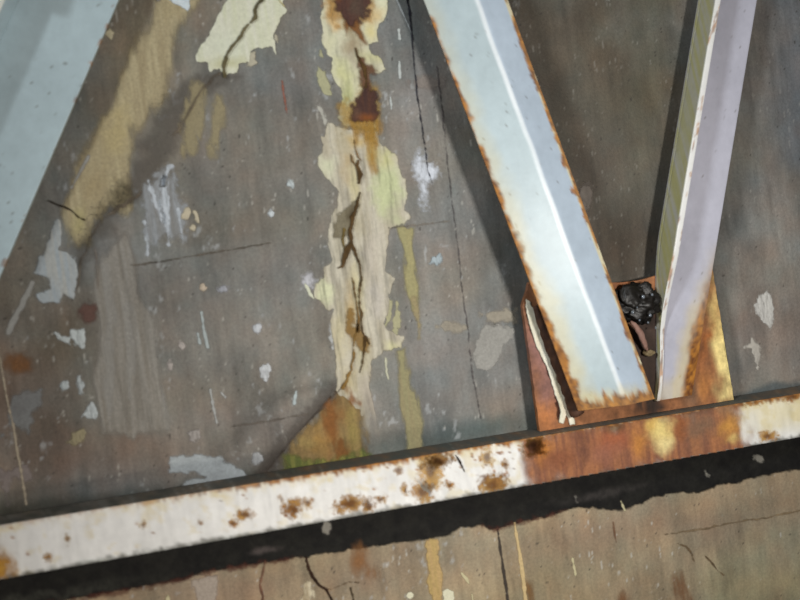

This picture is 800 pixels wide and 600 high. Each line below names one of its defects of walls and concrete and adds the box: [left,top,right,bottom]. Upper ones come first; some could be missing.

leakage [62,0,226,260]
peeling [196,0,287,74]
rust [328,0,371,42]
rust [341,57,379,171]
crack [355,48,367,88]
crack [406,0,430,176]
peeling [304,0,411,426]
crack [234,140,370,430]
peeling [754,292,774,328]
rust [523,406,744,484]
rust [334,495,385,514]
crack [305,557,333,600]